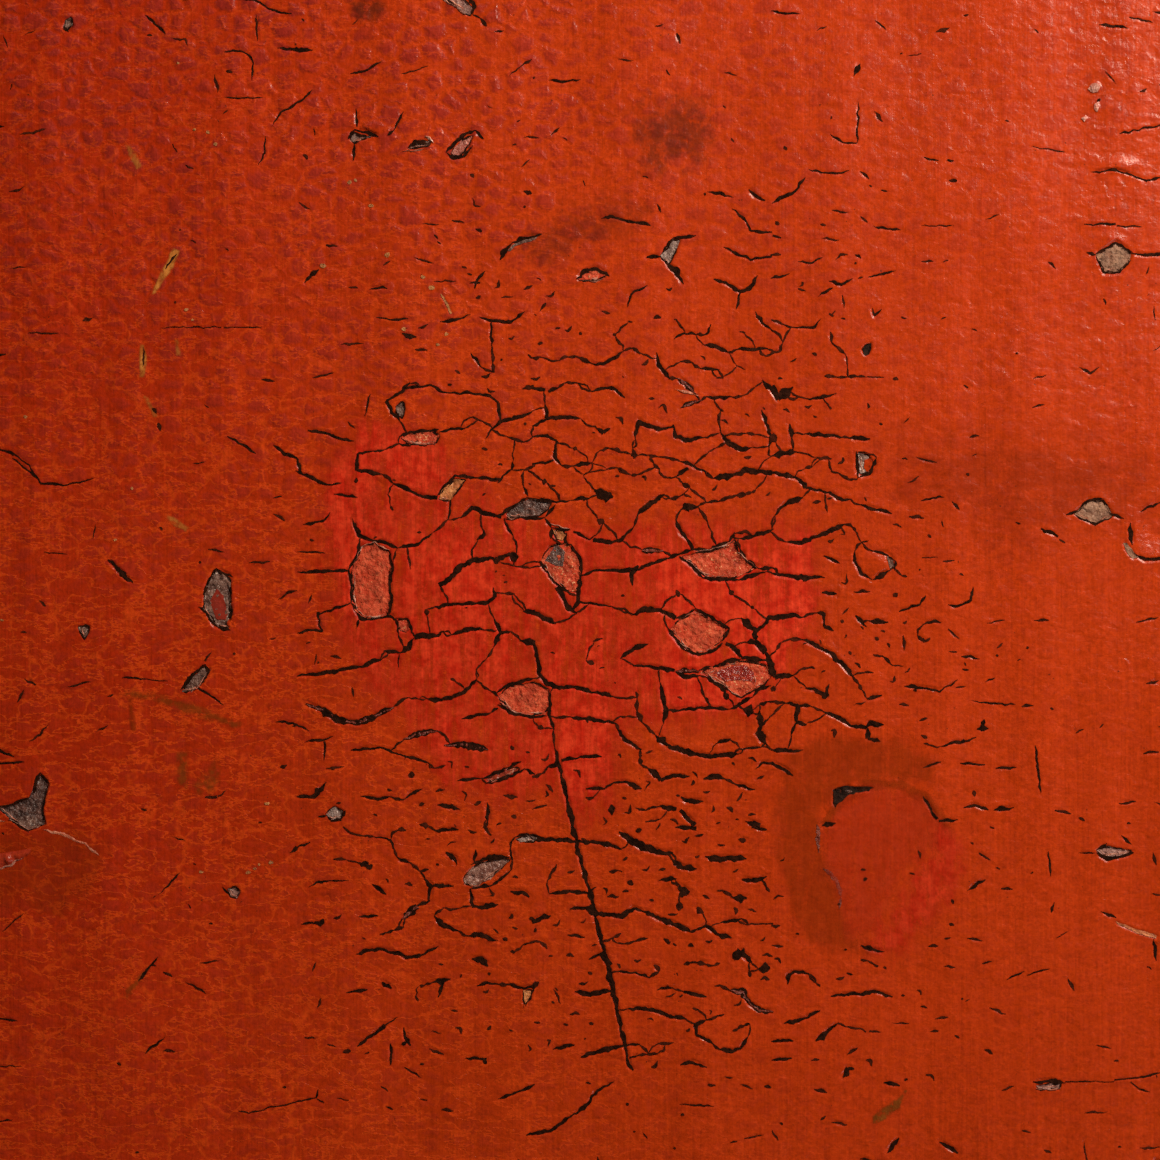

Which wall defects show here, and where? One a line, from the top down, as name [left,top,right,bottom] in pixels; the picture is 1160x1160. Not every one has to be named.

crack [900,14,969,56]
spalling [1087,242,1160,274]
crack [0,449,93,486]
spalling [1066,498,1124,526]
spalling [199,568,233,631]
spalling [297,518,432,666]
crack [228,64,1085,1160]
crack [198,652,236,705]
spalling [0,772,50,831]
peeling [0,848,31,870]
spalling [463,833,541,889]
crack [117,1037,175,1065]